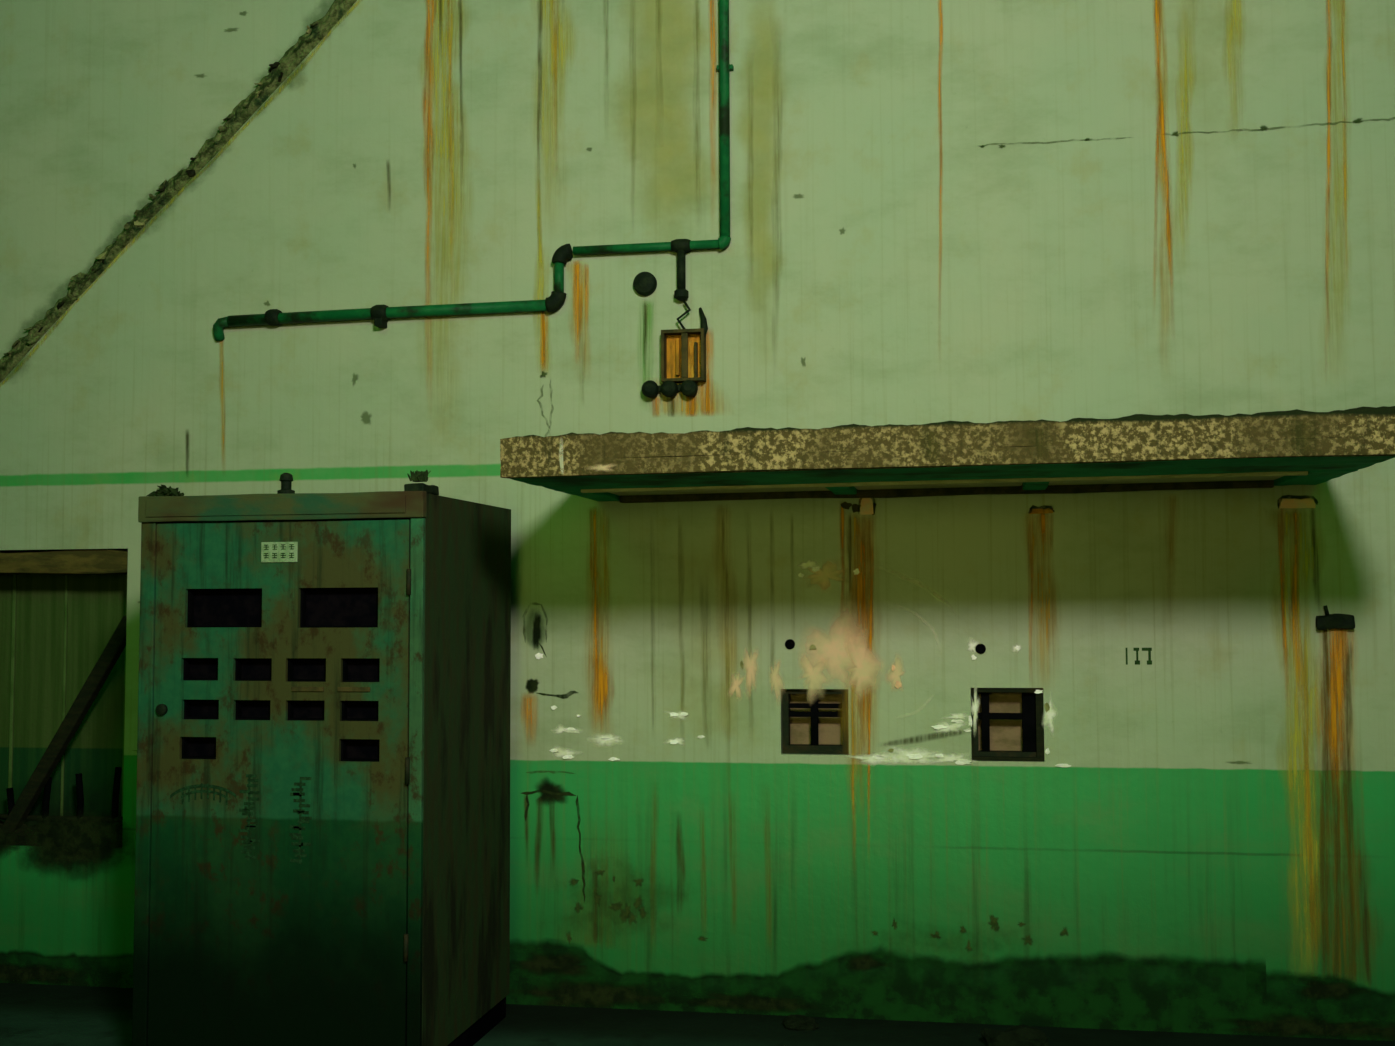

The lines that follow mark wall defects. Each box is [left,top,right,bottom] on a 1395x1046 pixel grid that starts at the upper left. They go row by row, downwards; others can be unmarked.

rust [424,0,461,260]
rust [1155,0,1171,265]
rust [1327,34,1346,201]
rust [537,201,545,364]
rust [593,512,608,714]
rust [841,507,873,655]
rust [852,681,871,803]
rust [1279,509,1369,973]
water stain [506,920,1395,1041]